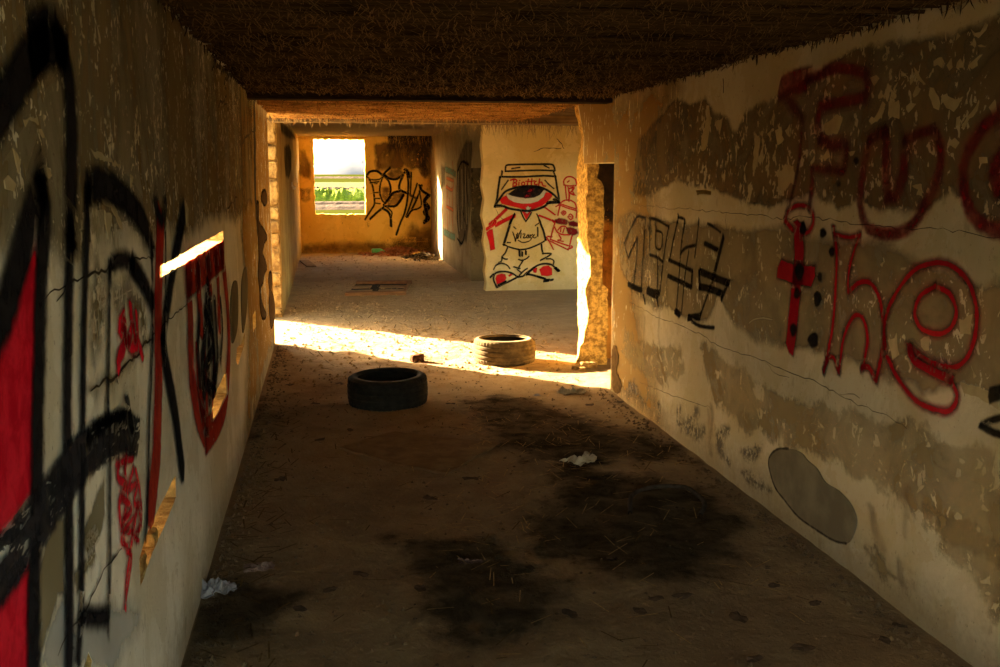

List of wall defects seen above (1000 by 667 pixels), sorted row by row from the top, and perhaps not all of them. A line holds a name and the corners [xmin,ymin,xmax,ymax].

peeling [633,16,1000,225]
crack [632,203,991,238]
crack [47,268,109,301]
crack [630,302,907,429]